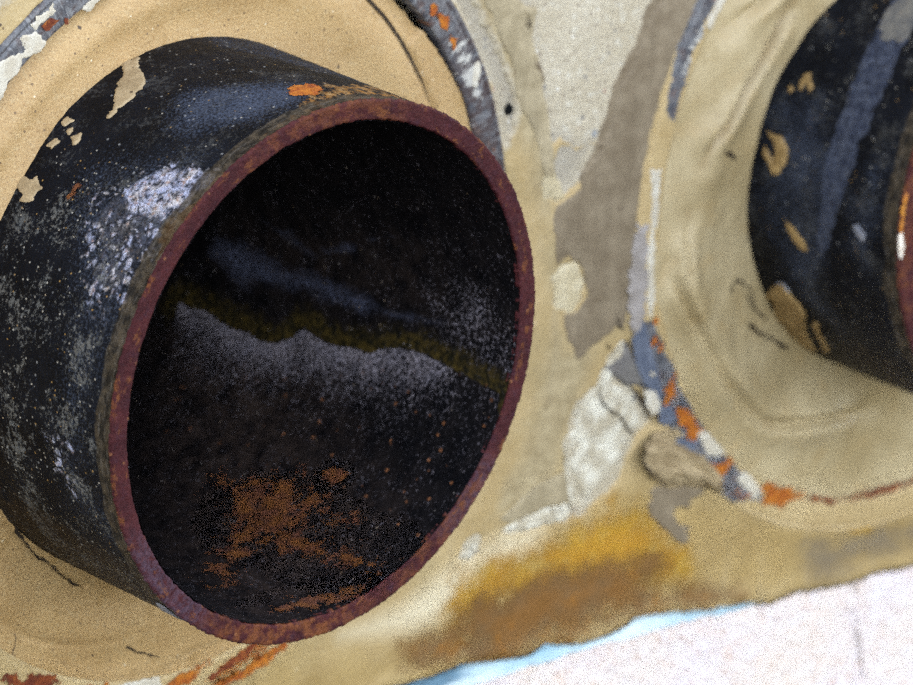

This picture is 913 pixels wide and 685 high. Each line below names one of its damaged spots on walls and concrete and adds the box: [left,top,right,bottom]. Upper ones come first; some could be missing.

peeling [0,3,56,100]
peeling [106,57,145,119]
peeling [46,116,82,149]
peeling [17,176,42,202]
spalling [501,168,726,544]
crack [599,309,661,437]
crack [643,459,669,488]
rust [711,456,735,484]
rust [761,480,913,509]
rust [201,465,380,614]
rust [1,673,61,685]
rust [168,642,287,685]